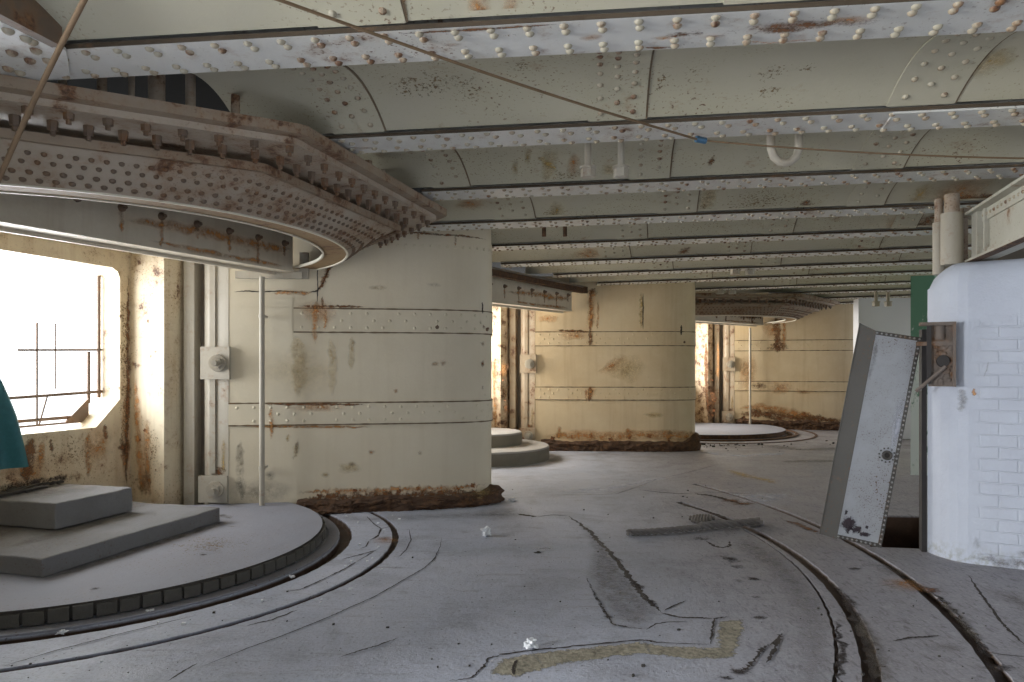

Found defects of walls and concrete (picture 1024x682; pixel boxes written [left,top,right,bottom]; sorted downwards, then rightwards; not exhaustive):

corrosion [144,220,285,265]
corrosion [305,300,361,339]
corrosion [559,288,599,345]
corrosion [716,316,787,352]
corrosion [118,281,160,491]
corrosion [741,405,841,422]
corrosion [0,425,108,491]
crack [519,514,712,630]
crack [968,575,1024,657]